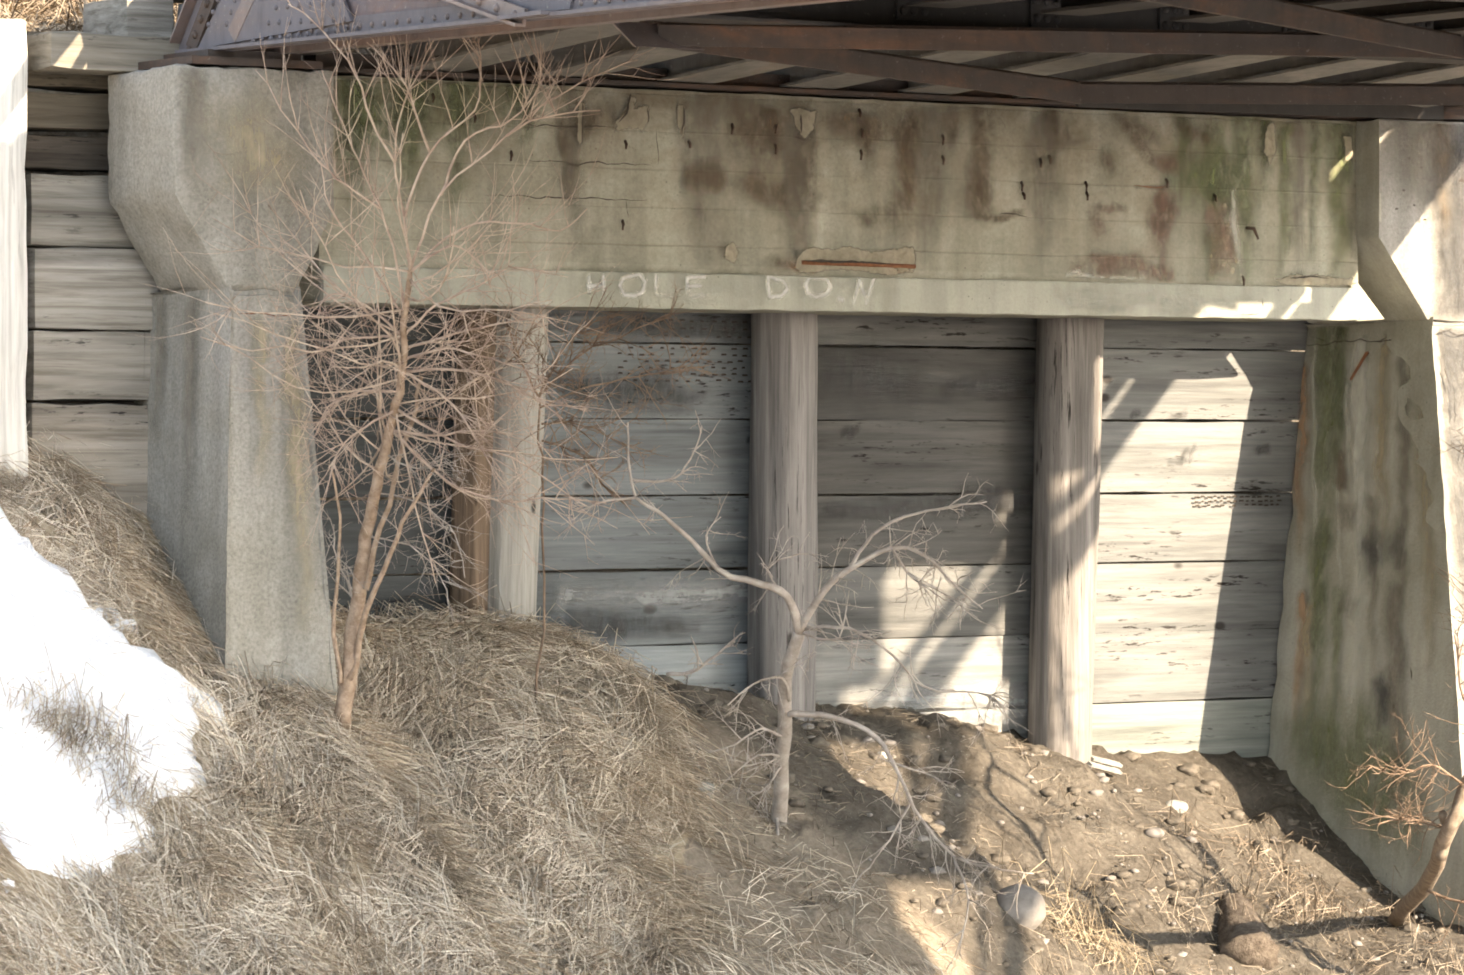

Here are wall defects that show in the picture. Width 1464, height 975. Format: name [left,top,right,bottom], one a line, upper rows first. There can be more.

water stain [735,106,918,208]
water stain [949,110,1010,221]
water stain [1178,117,1319,244]
water stain [1302,329,1434,734]